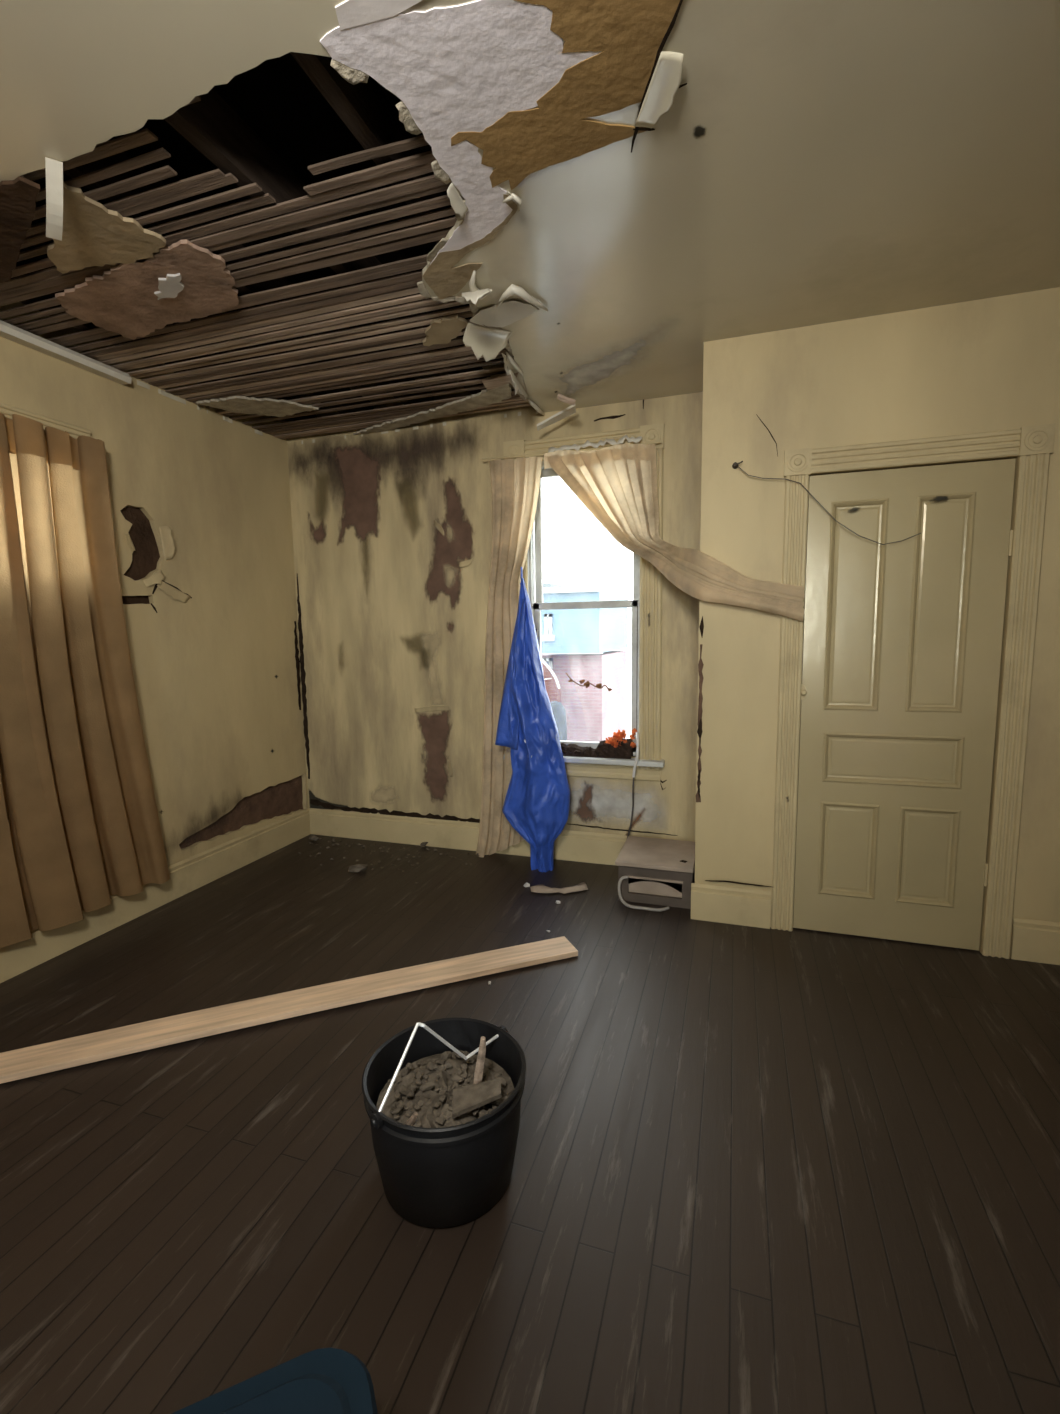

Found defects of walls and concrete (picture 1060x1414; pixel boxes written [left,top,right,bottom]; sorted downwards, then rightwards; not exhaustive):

peeling [320,0,684,416]
water stain [295,443,345,520]
peeling [308,447,381,544]
water stain [359,431,474,532]
hole [120,506,192,613]
peeling [425,478,473,632]
water stain [406,634,442,704]
peeling [414,705,453,801]